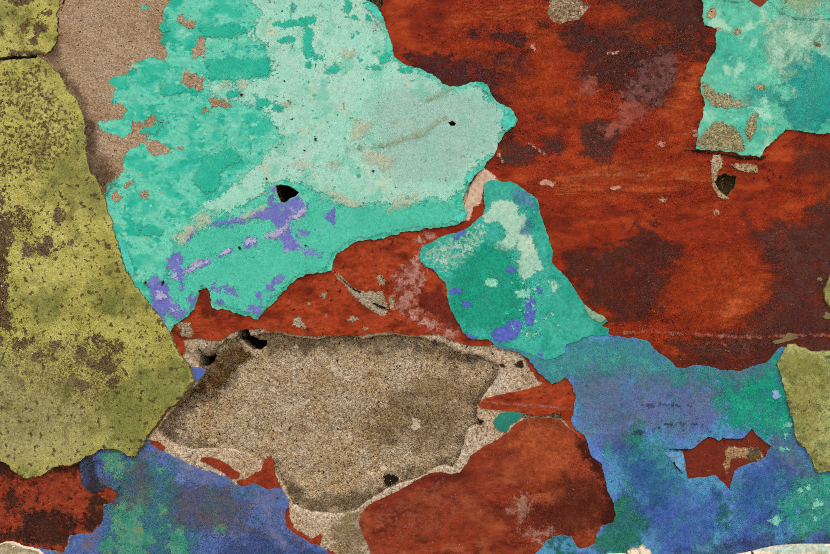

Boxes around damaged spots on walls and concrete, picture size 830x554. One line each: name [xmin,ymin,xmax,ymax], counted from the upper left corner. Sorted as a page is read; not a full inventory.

crack [0,0,65,61]
flaking render [722,445,750,471]
flaking render [746,447,762,462]
peeling [802,523,830,544]